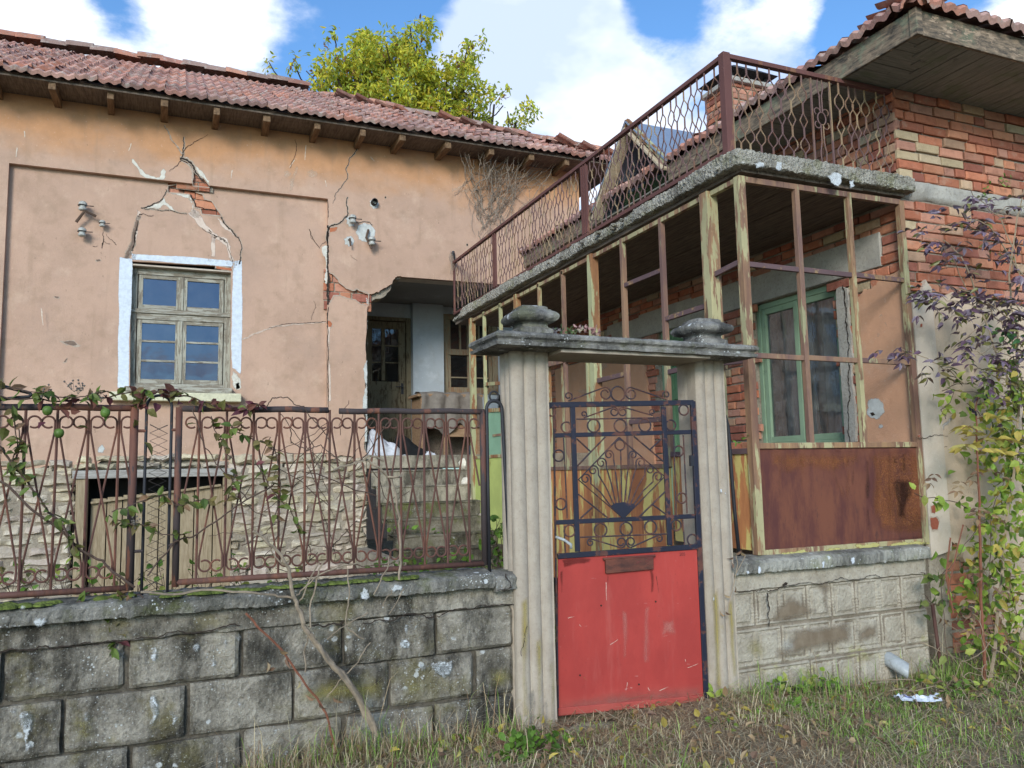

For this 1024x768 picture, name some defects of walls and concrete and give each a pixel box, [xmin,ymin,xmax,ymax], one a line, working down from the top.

crack [93,125,243,264]
flaking render [131,157,234,271]
crack [242,149,373,401]
flaking render [322,245,371,344]
crack [836,285,858,442]
rust [867,458,919,528]
water stain [775,600,810,620]
water stain [780,624,876,656]